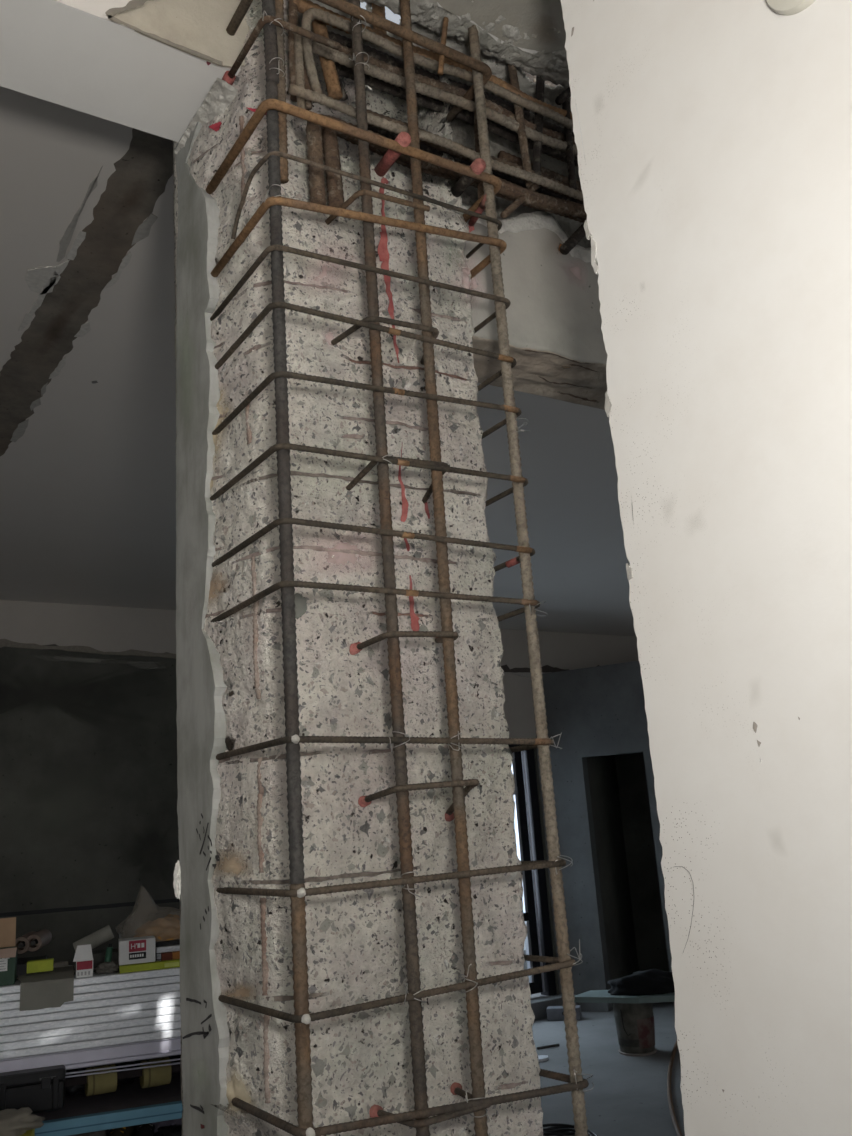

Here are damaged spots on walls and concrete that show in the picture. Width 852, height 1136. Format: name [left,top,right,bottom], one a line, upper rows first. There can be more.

spalling [287,0,574,132]
peeling [0,0,249,456]
spalling [584,220,599,275]
flaking render [294,593,307,619]
corrosion [226,1076,250,1110]